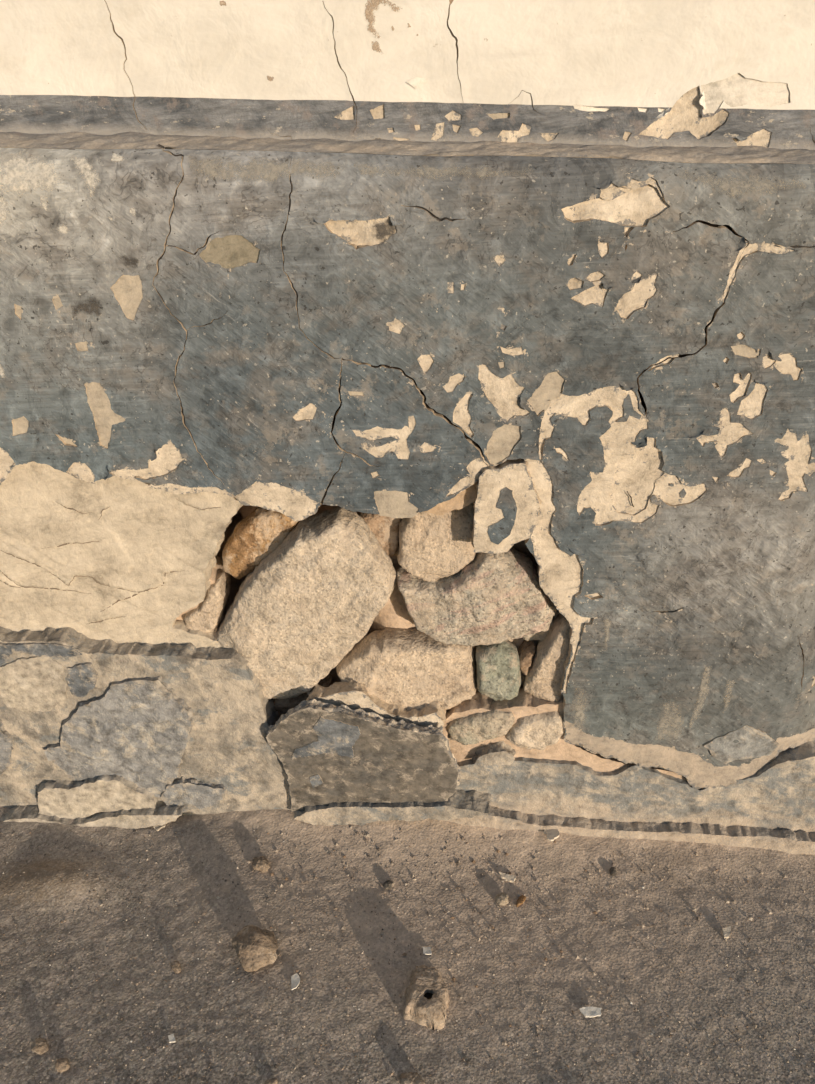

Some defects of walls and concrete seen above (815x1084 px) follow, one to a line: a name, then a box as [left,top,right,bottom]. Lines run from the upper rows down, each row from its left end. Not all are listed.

crack [323,2,357,129]
crack [447,0,463,99]
peeling [562,177,670,237]
crack [153,144,227,476]
crack [281,136,488,505]
peeling [567,271,658,318]
peeling [353,416,436,459]
crack [1,503,184,624]
peeling [374,332,815,694]
flaking render [0,444,320,831]
flaking render [266,679,516,826]
peeling [563,715,815,789]